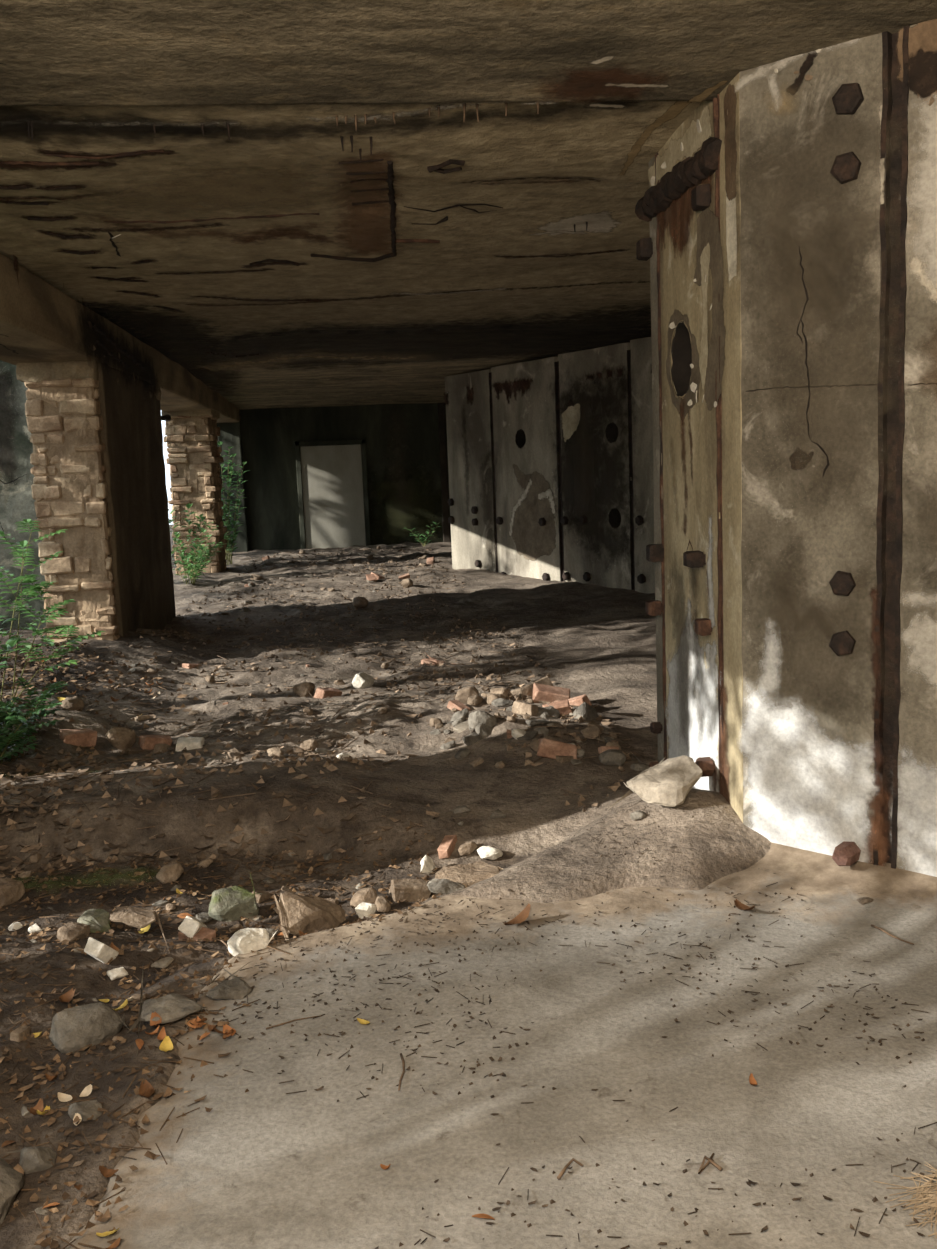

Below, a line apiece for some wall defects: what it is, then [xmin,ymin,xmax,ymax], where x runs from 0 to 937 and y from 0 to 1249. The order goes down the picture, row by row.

spalling [243,136,440,268]
corrosion [492,378,533,403]
peeling [562,400,580,442]
corrosion [671,402,692,534]
crack [747,248,830,476]
corrosion [867,589,889,866]